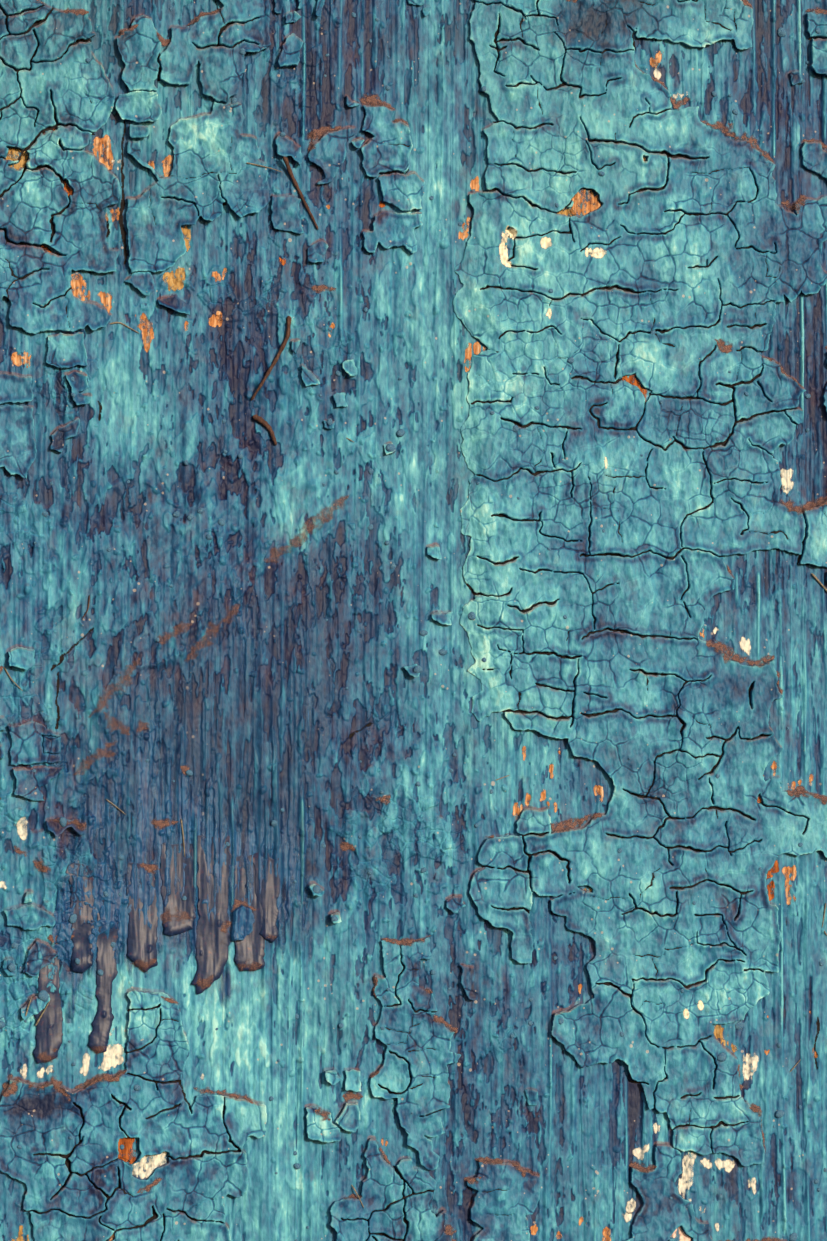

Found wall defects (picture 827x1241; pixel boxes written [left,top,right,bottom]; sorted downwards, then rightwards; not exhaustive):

crack [0,0,258,327]
crack [379,144,409,175]
corrosion [266,496,349,562]
peeling [445,0,827,1241]
crack [466,0,825,1151]
corrosion [74,661,148,775]
corrosion [787,786,827,805]
crack [24,1004,223,1241]
crack [168,1095,241,1160]
peeling [305,937,461,1241]
crack [341,1166,434,1241]